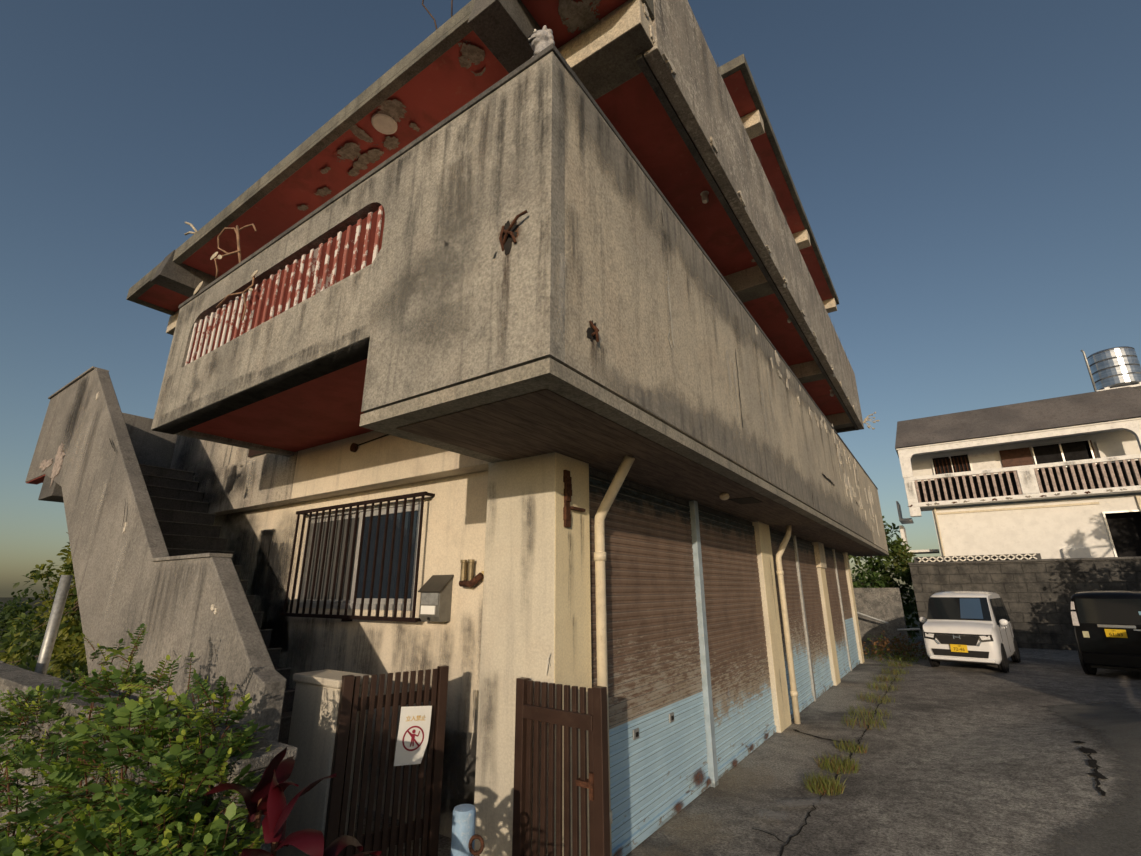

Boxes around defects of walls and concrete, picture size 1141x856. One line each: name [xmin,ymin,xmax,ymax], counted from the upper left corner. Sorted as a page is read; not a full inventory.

peeling [558,0,601,33]
peeling [374,99,420,132]
damp [458,101,505,160]
peeling [315,125,400,197]
peeling [39,442,65,488]
corrosion [694,770,711,786]
crack [752,666,904,856]